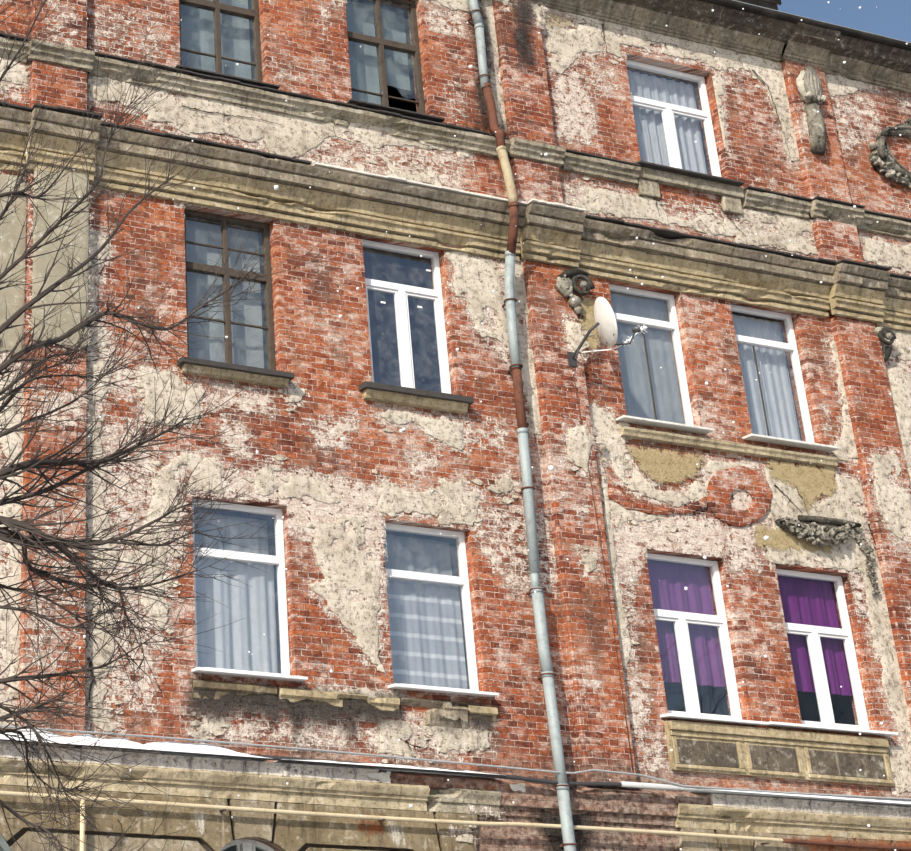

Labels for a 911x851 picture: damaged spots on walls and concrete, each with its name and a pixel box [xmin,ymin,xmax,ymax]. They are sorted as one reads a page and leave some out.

peeling [0,57,31,94]
peeling [420,0,518,133]
peeling [531,2,800,169]
peeling [560,175,818,258]
peeling [559,311,595,362]
peeling [86,224,340,745]
peeling [369,403,472,461]
peeling [367,468,521,531]
peeling [303,516,390,673]
peeling [559,330,911,798]
crack [87,657,96,702]
peeling [295,678,500,783]